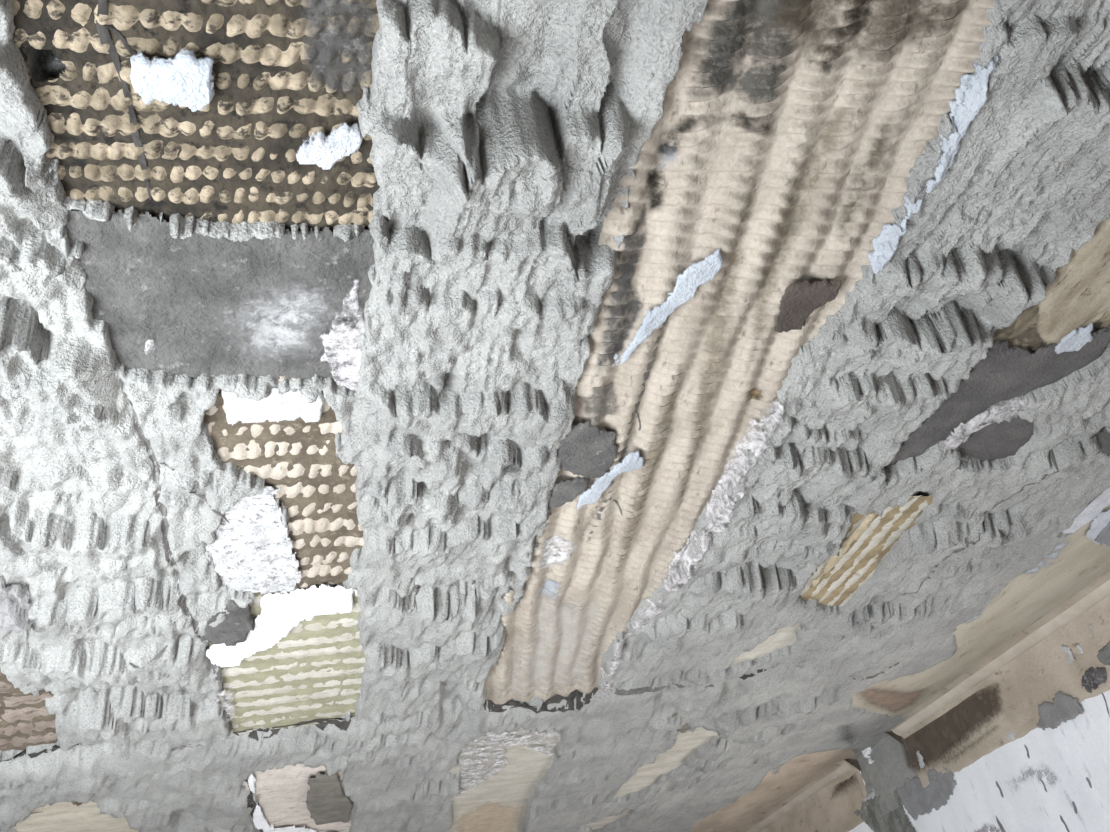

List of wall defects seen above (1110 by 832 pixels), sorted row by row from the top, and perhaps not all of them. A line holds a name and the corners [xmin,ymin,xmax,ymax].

spalling [12,0,380,734]
spalling [484,0,999,705]
spalling [884,217,1110,469]
crack [119,379,355,751]
spalling [852,488,1110,717]
spalling [0,669,58,751]
spalling [12,801,139,832]
spalling [243,763,353,832]
spalling [447,727,562,832]
spalling [613,713,720,800]
spalling [854,766,957,832]